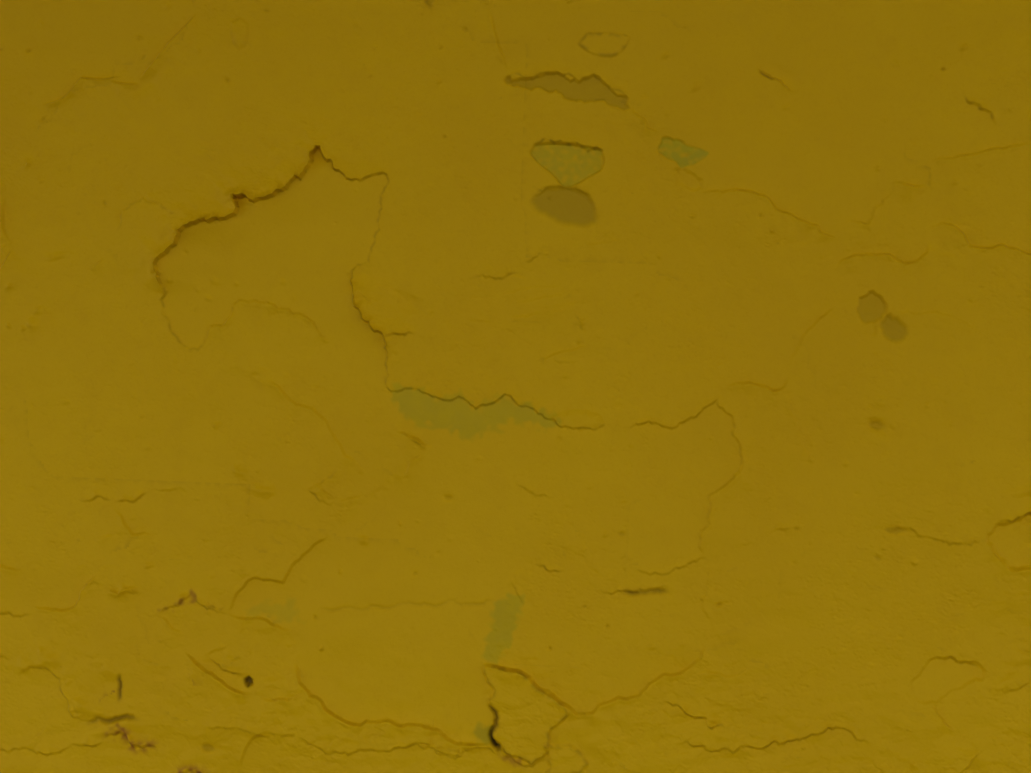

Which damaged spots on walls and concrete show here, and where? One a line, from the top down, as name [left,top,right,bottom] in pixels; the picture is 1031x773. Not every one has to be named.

peeling [501,67,634,112]
peeling [527,132,606,186]
peeling [480,661,566,769]